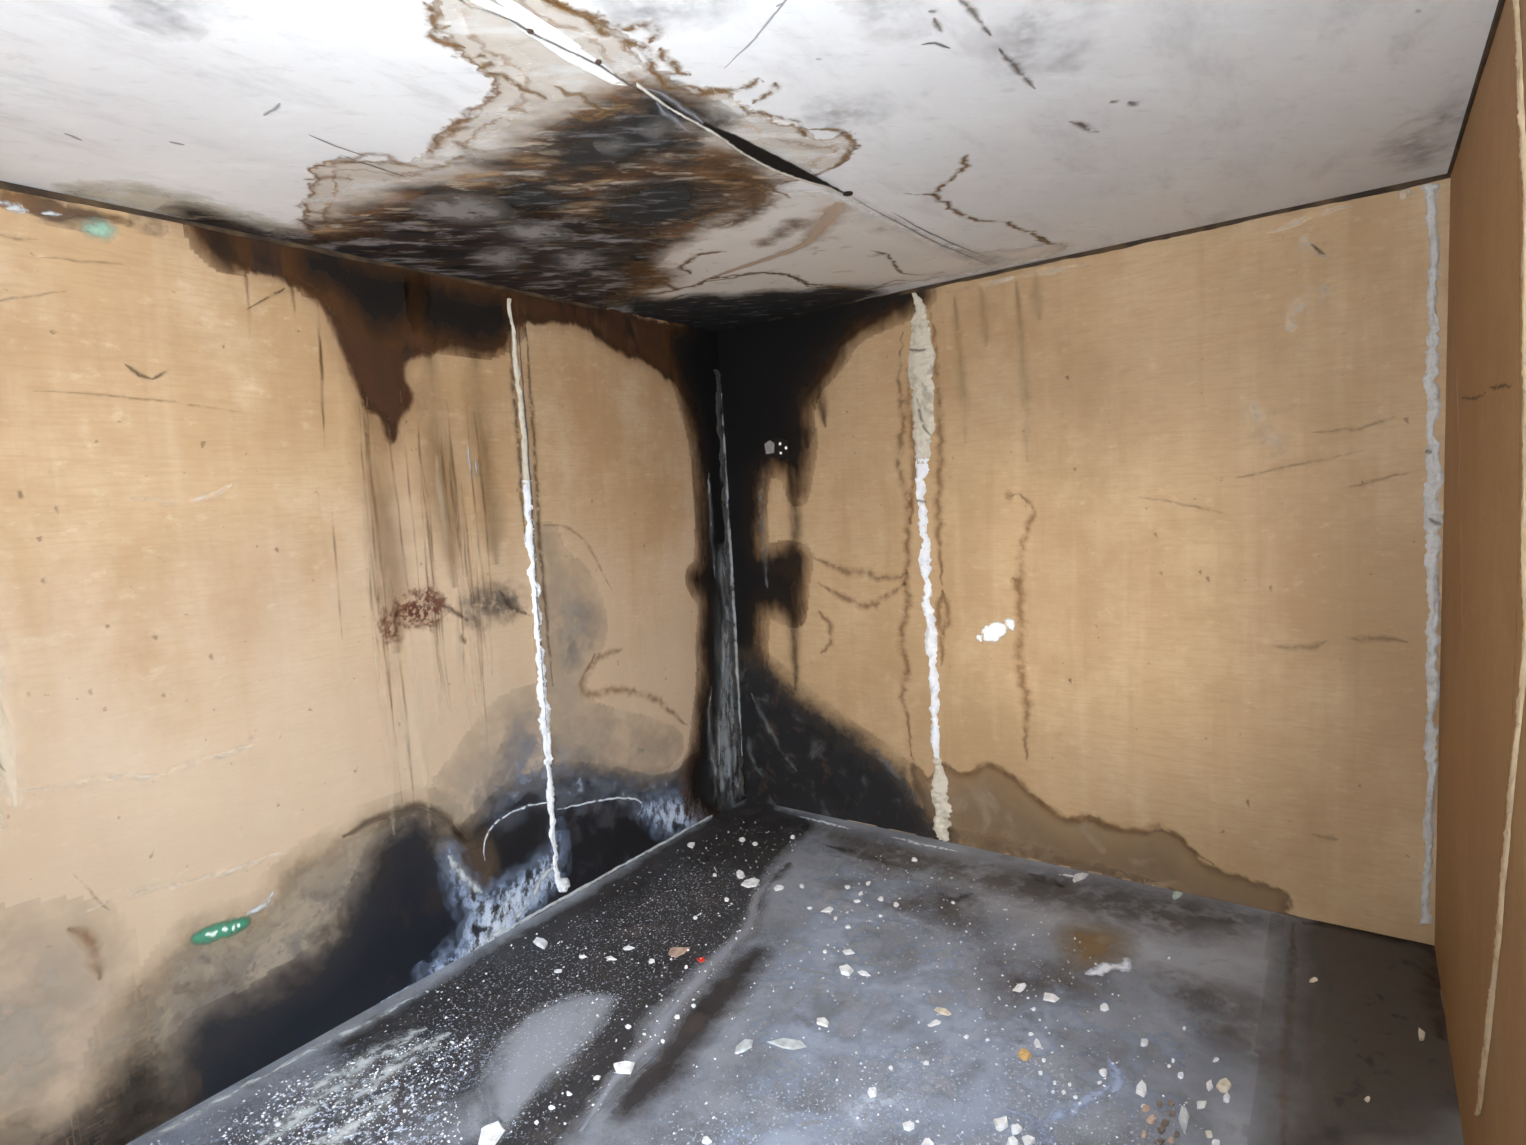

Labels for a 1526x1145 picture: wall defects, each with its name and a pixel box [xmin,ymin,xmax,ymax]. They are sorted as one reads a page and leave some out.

crack [460,0,642,91]
crack [726,0,786,67]
crack [510,321,553,686]
corrosion [382,588,468,644]
leakage [27,0,1061,1145]
leakage [941,763,1295,916]
leakage [974,872,1237,930]
leakage [1006,1058,1125,1145]